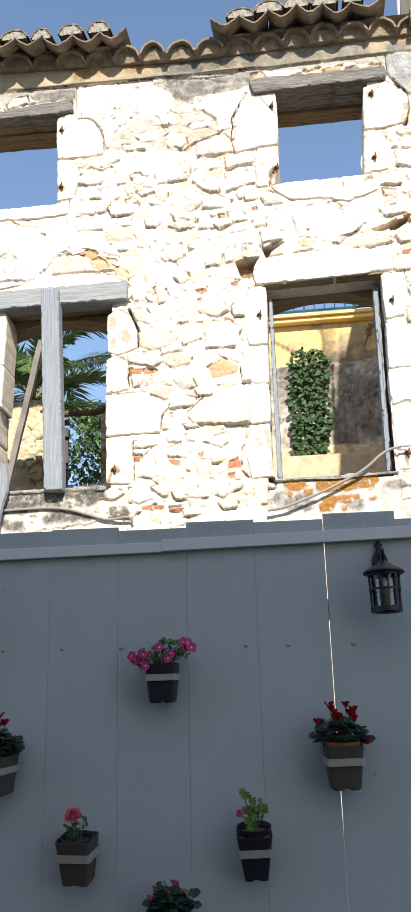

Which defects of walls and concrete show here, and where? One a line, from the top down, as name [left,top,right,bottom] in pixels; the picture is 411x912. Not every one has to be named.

water stain [2,484,108,530]
water stain [109,506,129,517]